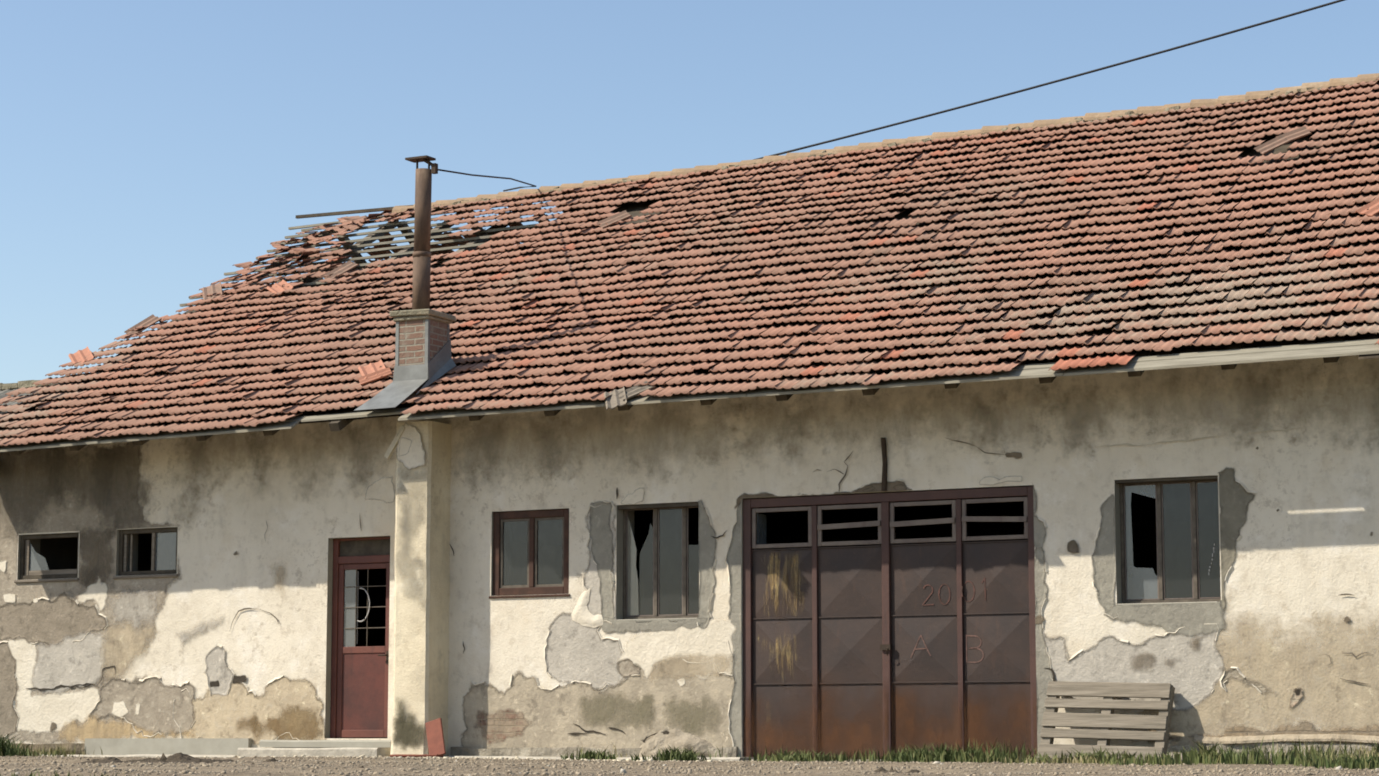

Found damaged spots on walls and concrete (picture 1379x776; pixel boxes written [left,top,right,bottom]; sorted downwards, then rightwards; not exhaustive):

peeling [0,442,327,744]
spalling [461,500,742,757]
corrosion [766,555,800,611]
spalling [1067,527,1100,553]
peeling [1035,598,1379,744]